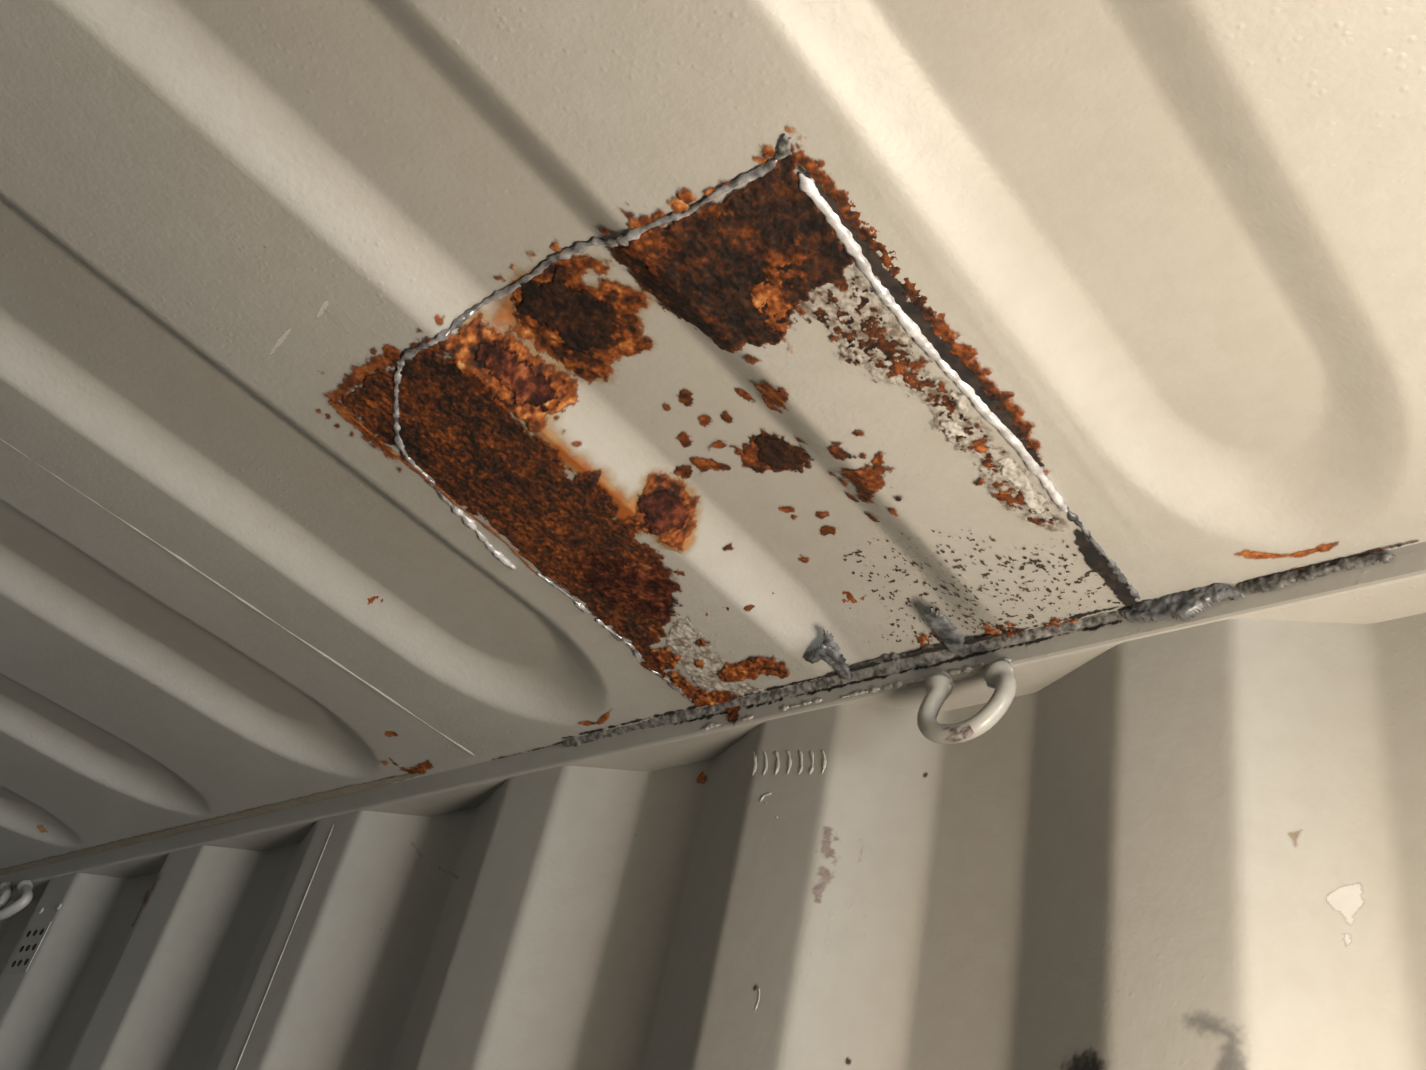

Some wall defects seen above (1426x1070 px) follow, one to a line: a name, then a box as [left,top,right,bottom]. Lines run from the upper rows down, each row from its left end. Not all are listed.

rust [316,127,1120,682]
peeling [792,266,1067,532]
rust [1235,541,1418,582]
rust [579,709,612,726]
rust [726,706,740,725]
peeling [1326,883,1364,946]